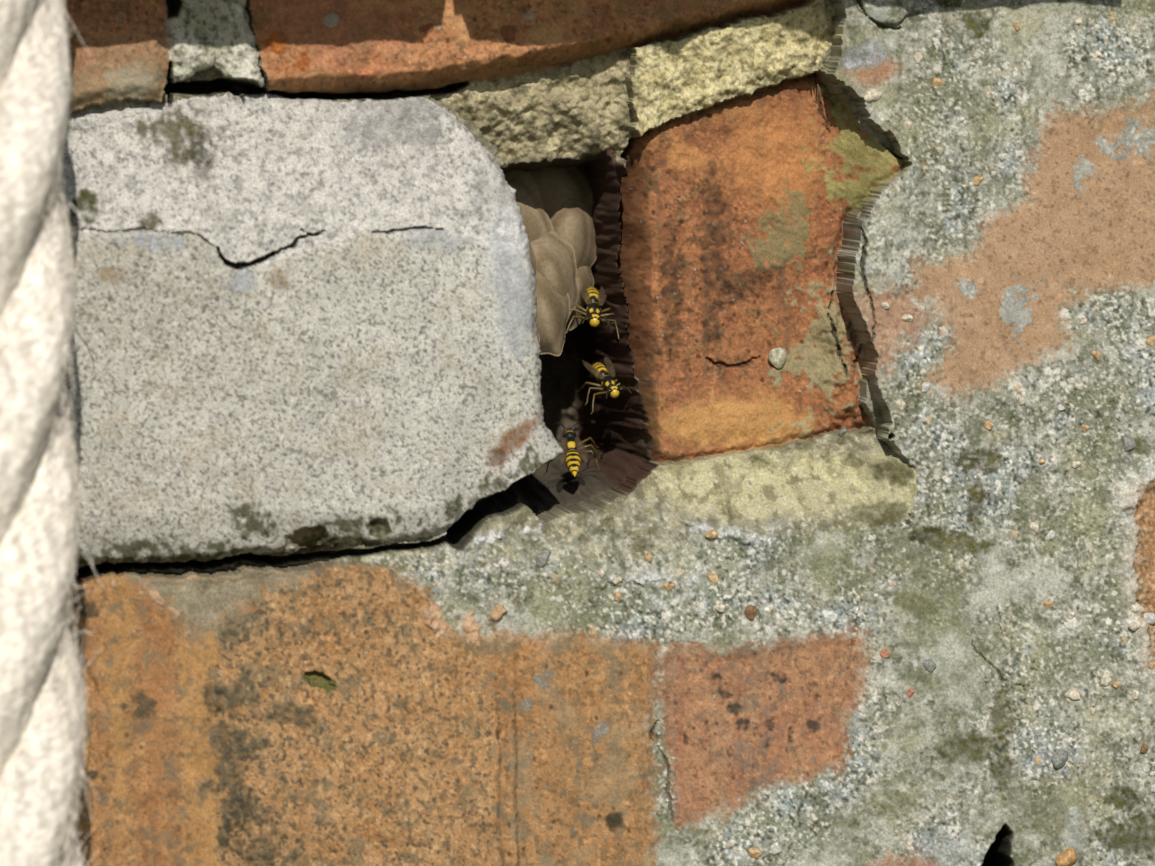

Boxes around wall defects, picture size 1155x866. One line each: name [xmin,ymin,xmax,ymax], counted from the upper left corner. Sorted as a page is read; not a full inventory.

crack [813,73,831,134]
crack [82,228,326,270]
crack [372,227,444,235]
crack [827,225,877,378]
peeling [836,93,1155,401]
crack [72,484,525,584]
peeling [1133,480,1155,670]
spalling [132,526,508,866]